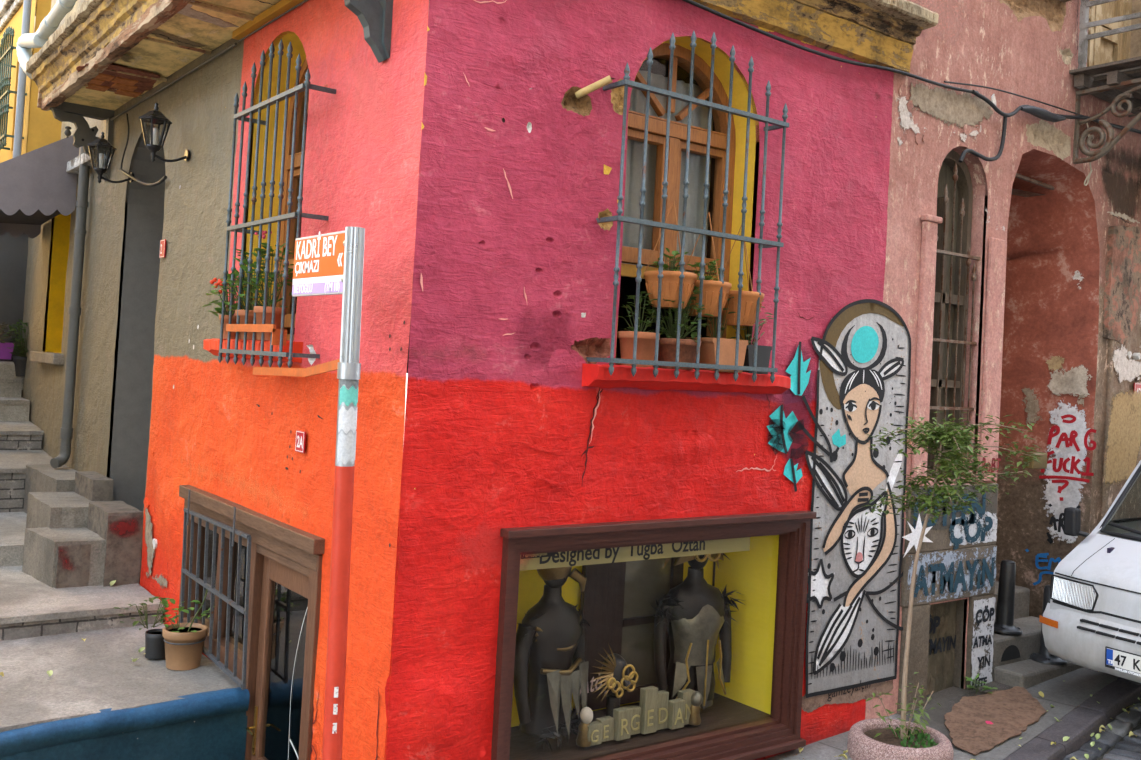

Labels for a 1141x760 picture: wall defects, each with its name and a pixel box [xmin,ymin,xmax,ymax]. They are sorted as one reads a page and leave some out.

flaking render [896,79,996,145]
crack [581,387,603,484]
spalling [1021,356,1093,426]
spalling [143,498,168,588]